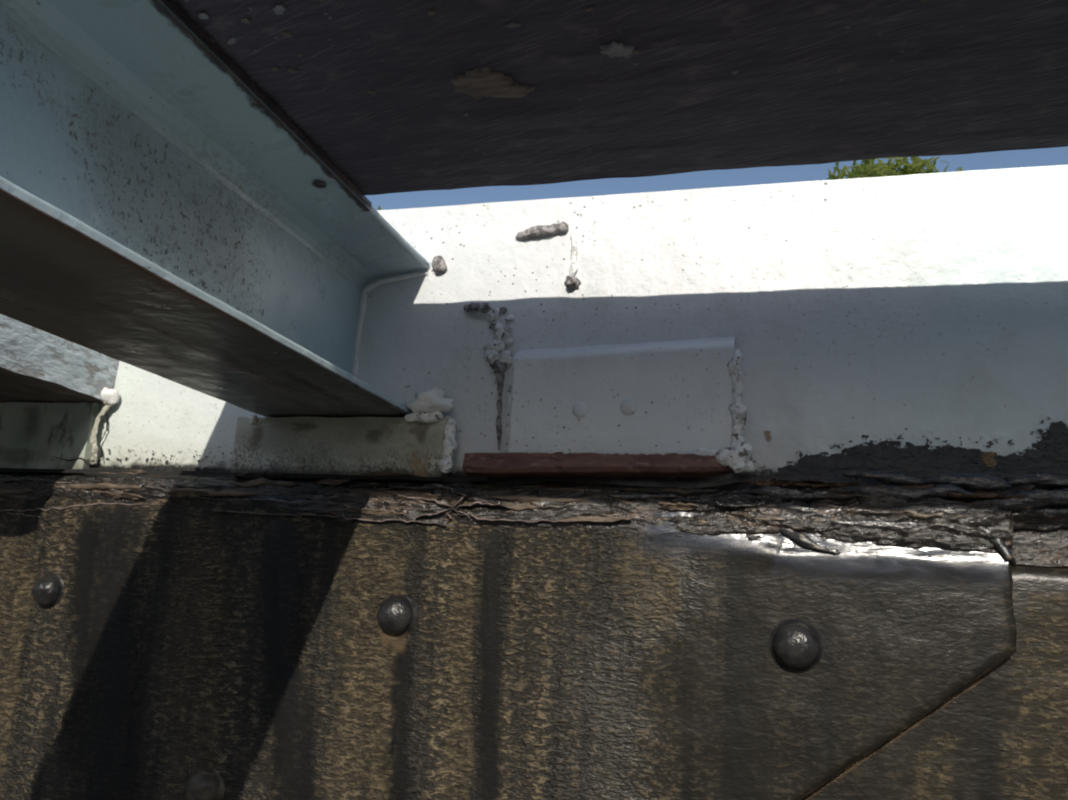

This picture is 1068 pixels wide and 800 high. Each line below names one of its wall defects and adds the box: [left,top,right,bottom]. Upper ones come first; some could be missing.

corrosion [150,0,372,212]
spalling [451,67,535,99]
peeling [599,41,635,58]
crack [206,489,573,526]
leakage [264,522,312,800]
leakage [388,646,408,800]
leakage [481,532,499,799]